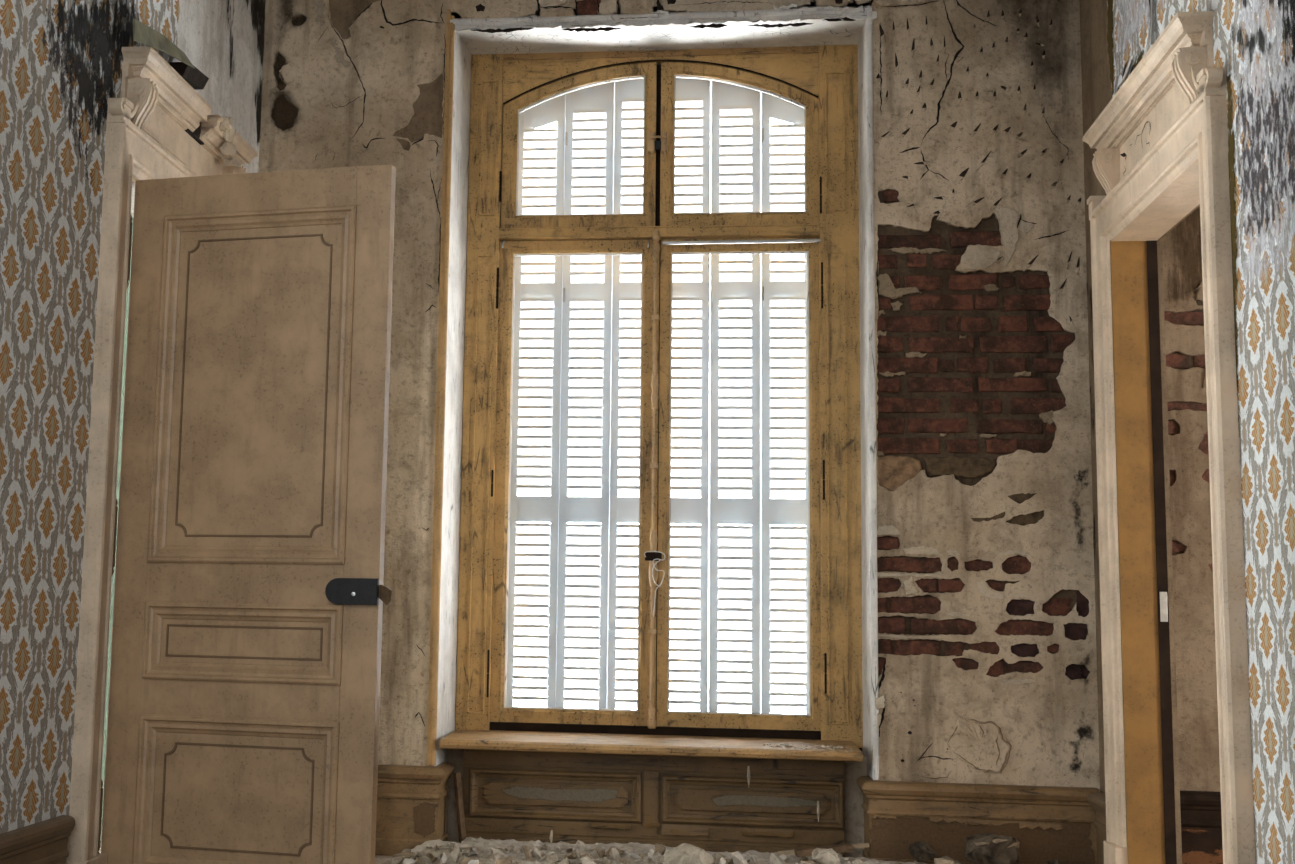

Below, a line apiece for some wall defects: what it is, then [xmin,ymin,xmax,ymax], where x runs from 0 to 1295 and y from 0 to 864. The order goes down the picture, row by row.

leakage [41,0,139,185]
peeling [392,74,444,151]
crack [877,33,885,112]
crack [899,0,1000,181]
leakage [1107,0,1165,95]
leakage [1168,206,1202,300]
leakage [1227,0,1295,435]
flaking render [876,151,1080,491]
spalling [1164,281,1204,326]
spalling [1166,352,1207,436]
spalling [1198,431,1210,483]
spalling [877,525,1090,684]